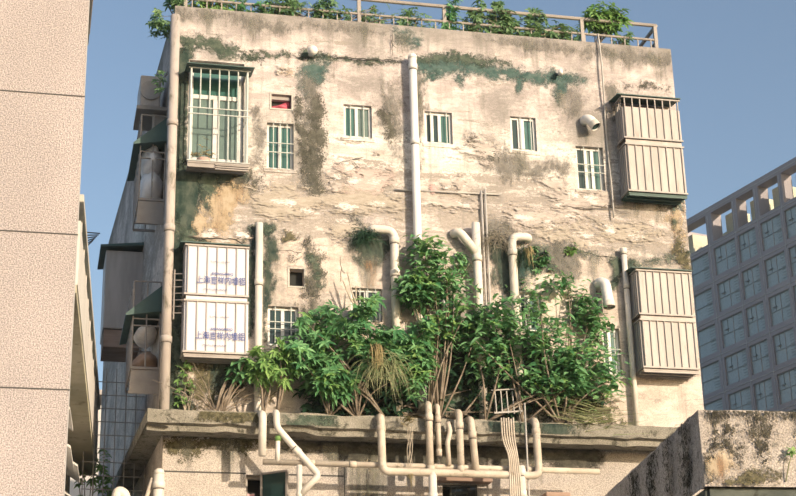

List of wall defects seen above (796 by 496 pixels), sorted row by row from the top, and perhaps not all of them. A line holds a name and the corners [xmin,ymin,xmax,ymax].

leakage [291,76,329,198]
leakage [376,84,407,162]
leakage [393,27,512,142]
leakage [605,79,671,122]
leakage [175,160,221,242]
spalling [193,229,254,244]
leakage [169,327,269,424]
leakage [426,335,628,434]
leakage [163,436,269,470]
leakage [280,440,605,496]
leakage [626,417,694,496]
leakage [701,410,796,486]